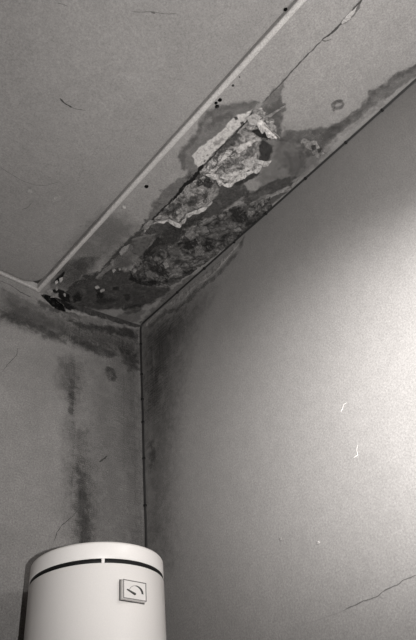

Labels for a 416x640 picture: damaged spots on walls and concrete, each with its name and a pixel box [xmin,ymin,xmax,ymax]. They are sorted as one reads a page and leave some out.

leakage [5,300,137,369]
leakage [59,259,191,323]
peeling [41,105,299,327]
crack [100,23,341,272]
leakage [139,65,416,263]
crack [300,575,416,626]